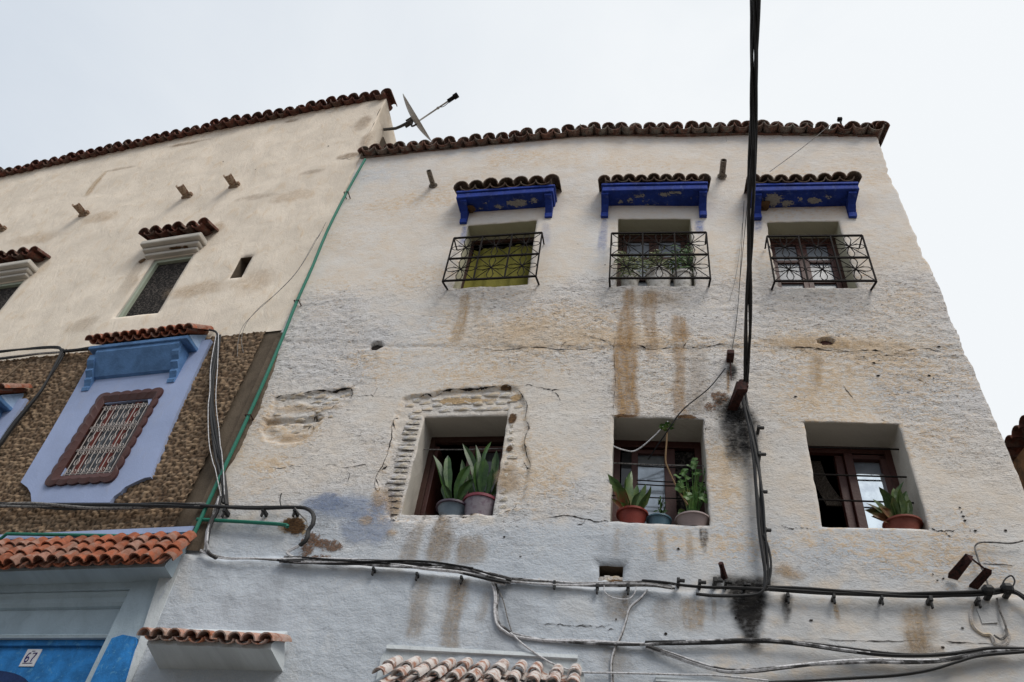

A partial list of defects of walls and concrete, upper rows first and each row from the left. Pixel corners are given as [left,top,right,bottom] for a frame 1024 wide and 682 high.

peeling [467,197,537,213]
peeling [761,192,832,211]
rust [613,292,639,418]
crack [792,346,943,357]
flaking render [271,388,353,434]
flaking render [376,384,530,520]
leakage [723,408,756,460]
leakage [728,582,766,647]